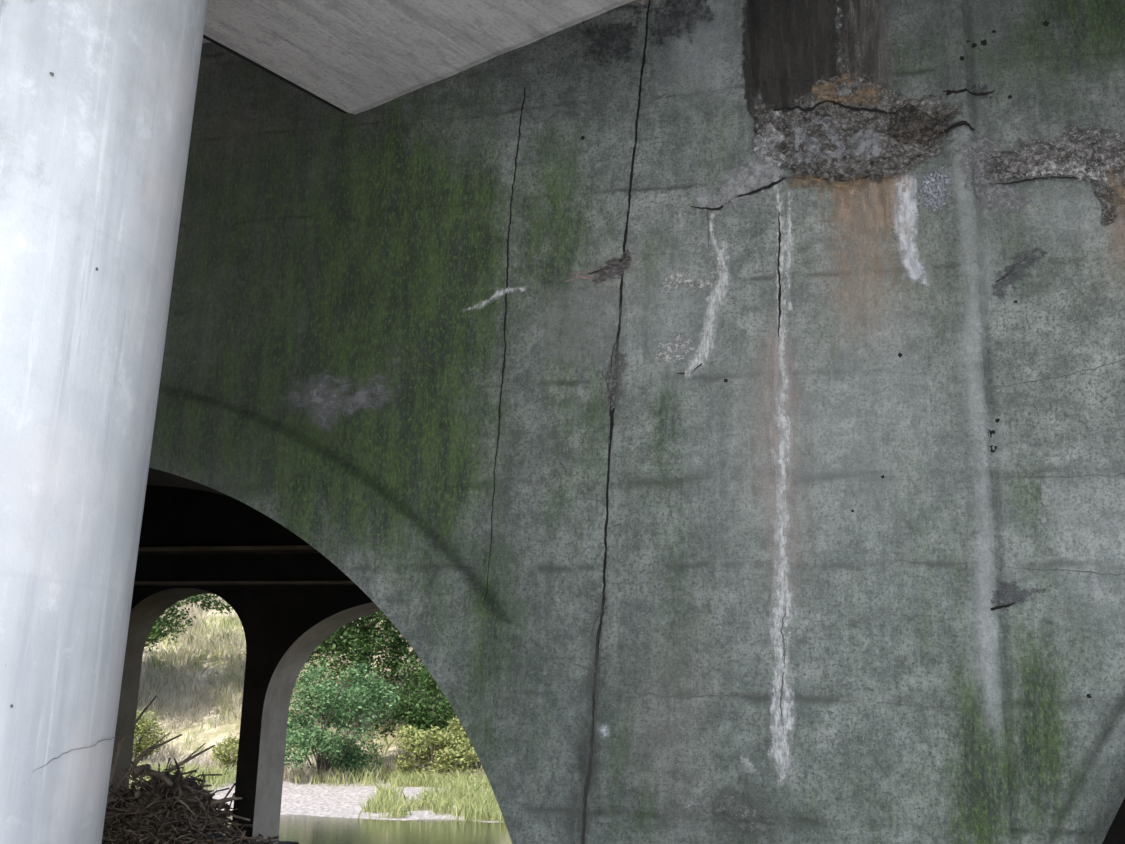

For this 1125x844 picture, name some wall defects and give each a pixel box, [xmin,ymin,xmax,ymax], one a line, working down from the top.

water stain [582,0,713,62]
water stain [742,0,900,135]
spalling [690,74,1125,225]
crack [482,87,526,606]
spalling [565,249,631,283]
crack [573,0,770,844]
water stain [655,209,730,376]
water stain [763,164,797,781]
water stain [893,176,925,283]